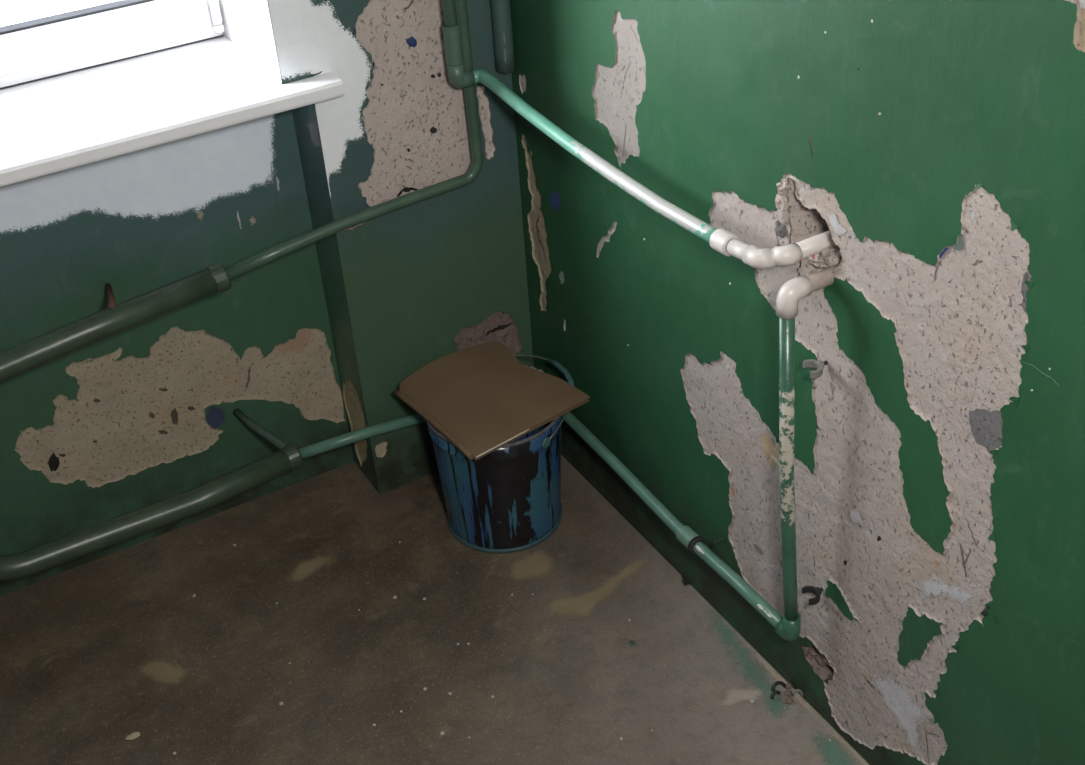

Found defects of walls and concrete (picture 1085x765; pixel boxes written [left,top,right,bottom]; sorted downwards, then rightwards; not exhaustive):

peeling [353,0,495,207]
peeling [591,10,646,169]
flaking render [1073,0,1085,52]
peeling [522,134,551,311]
peeling [15,326,388,489]
peeling [680,351,784,618]
peeling [708,173,1033,765]